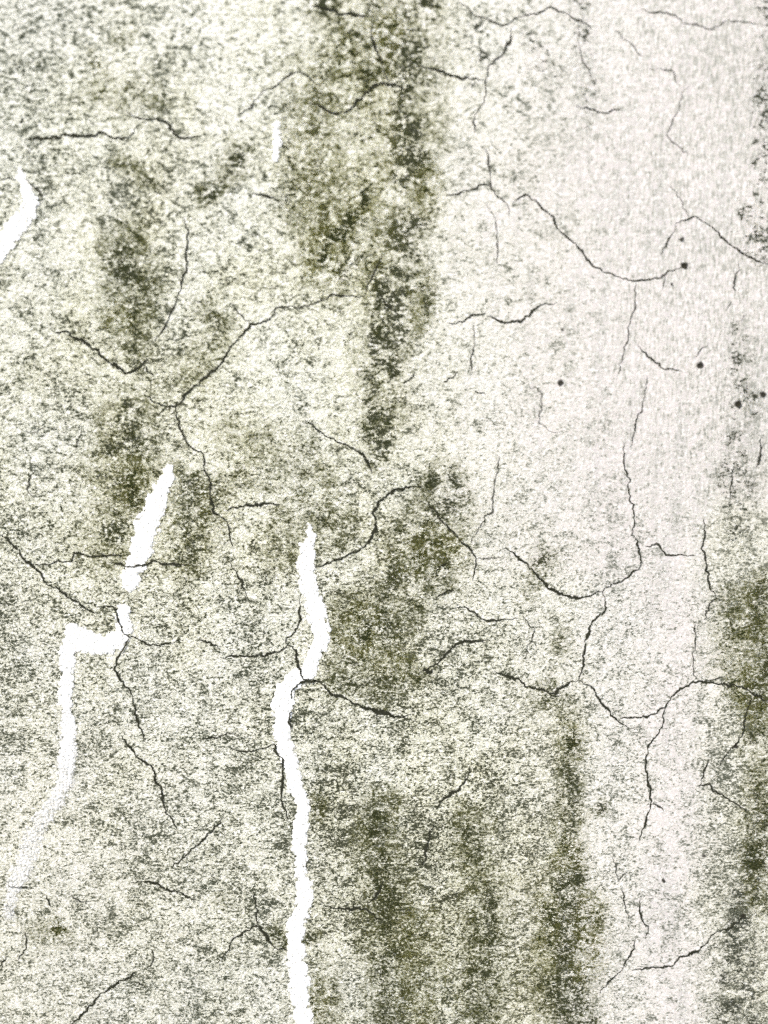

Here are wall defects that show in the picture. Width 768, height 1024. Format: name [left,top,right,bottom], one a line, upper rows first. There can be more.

crack [26,111,200,140]
crack [71,950,155,1024]
damp [92,221,164,362]
damp [79,379,252,579]
crack [1,535,411,900]
crack [55,219,401,603]
damp [277,0,451,471]
damp [327,458,480,710]
damp [349,672,609,1024]
crack [237,4,768,840]
crack [600,859,741,992]
damp [695,569,768,1024]